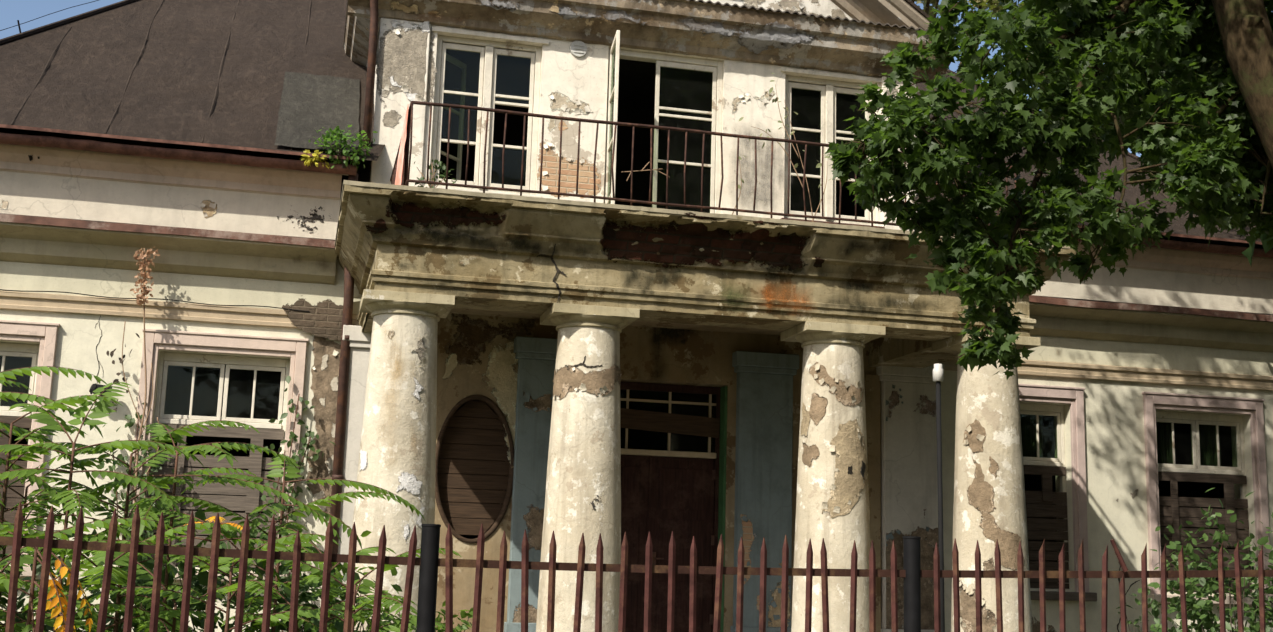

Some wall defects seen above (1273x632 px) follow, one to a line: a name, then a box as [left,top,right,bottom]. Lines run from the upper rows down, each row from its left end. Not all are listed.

peeling [479,0,519,12]
peeling [547,0,647,26]
peeling [680,0,846,54]
flaking render [376,0,439,128]
flaking render [537,90,601,198]
crack [537,244,566,303]
crack [565,356,603,368]
flaking render [482,341,621,468]
peeling [800,362,868,518]
peeling [963,419,1025,570]
peeling [523,504,544,550]
flaking render [959,580,997,632]